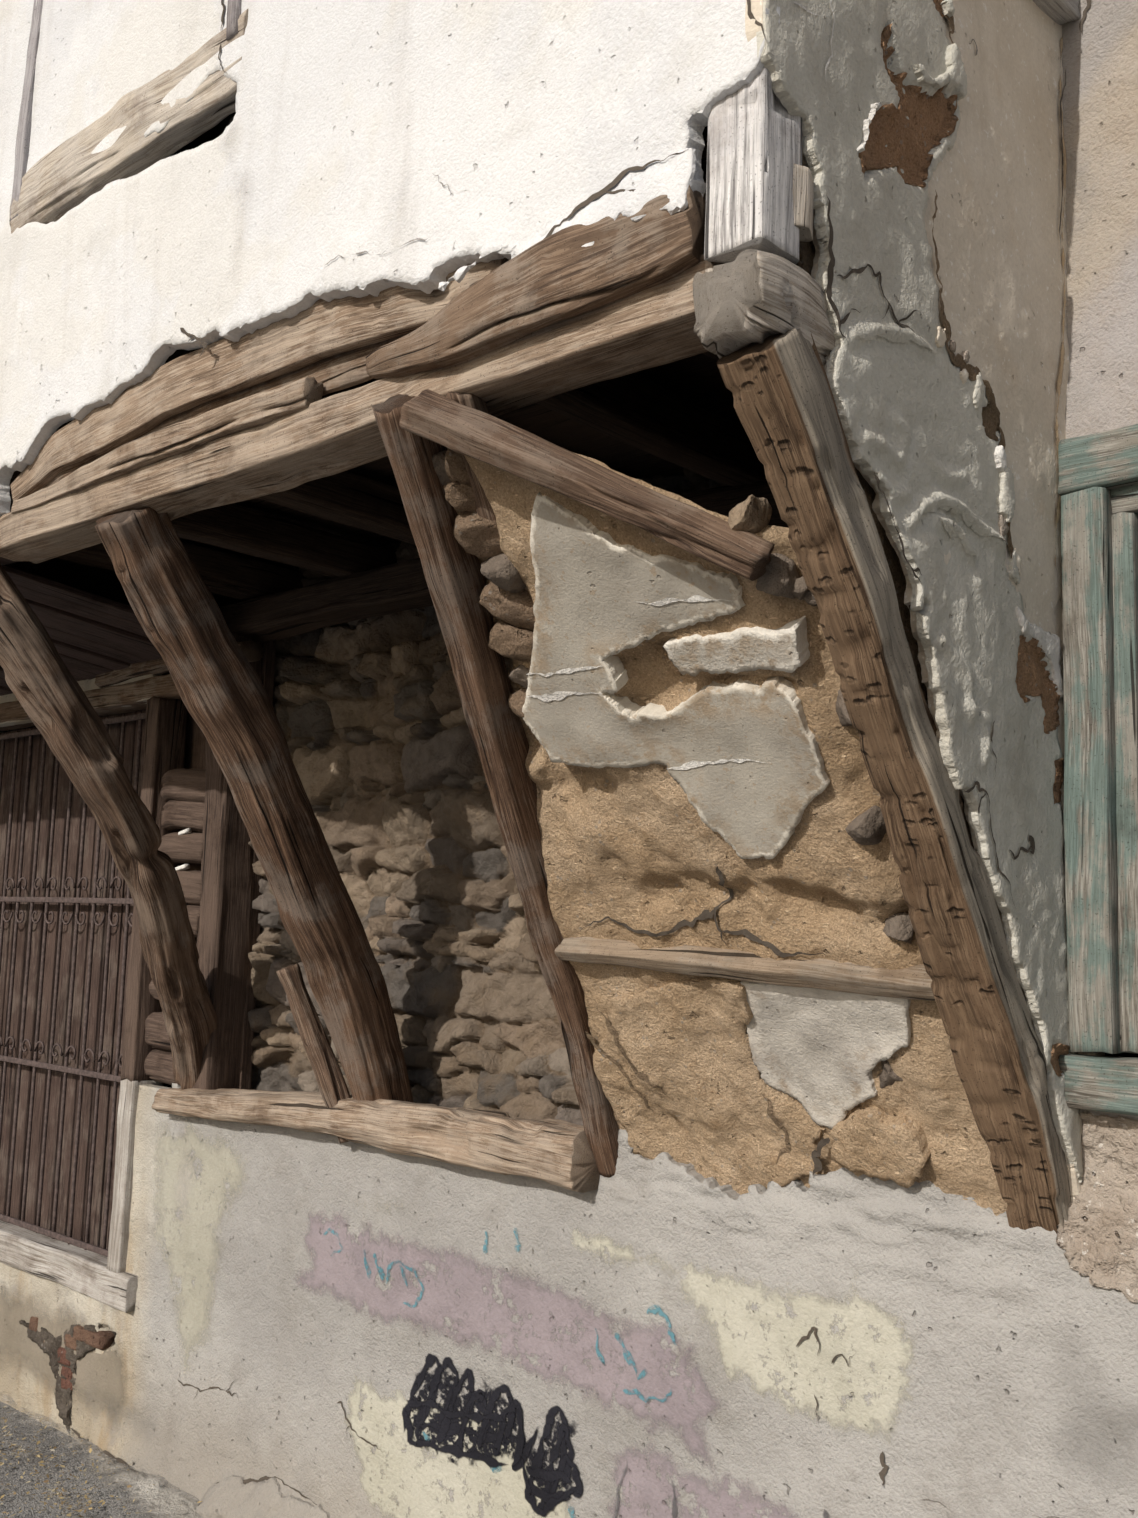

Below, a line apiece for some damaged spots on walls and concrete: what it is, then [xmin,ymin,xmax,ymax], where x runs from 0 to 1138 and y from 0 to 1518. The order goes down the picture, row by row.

crack [747,0,766,68]
crack [1079,0,1091,33]
crack [1058,70,1066,254]
crack [826,195,925,342]
flaking render [857,0,1022,585]
flaking render [522,492,830,859]
flaking render [1015,606,1064,734]
crack [579,866,826,958]
flaking render [585,976,931,1195]
flaking render [1056,1112,1138,1303]